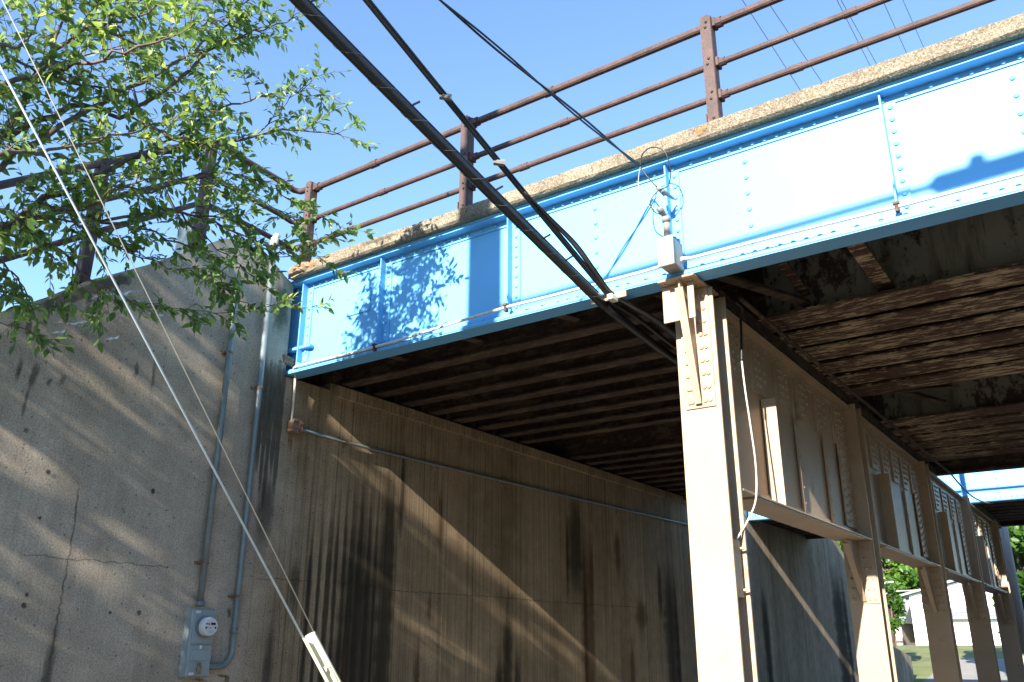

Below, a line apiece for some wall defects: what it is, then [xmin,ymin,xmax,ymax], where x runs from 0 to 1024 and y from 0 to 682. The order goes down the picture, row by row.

leakage [566,506,588,682]
leakage [658,572,682,682]